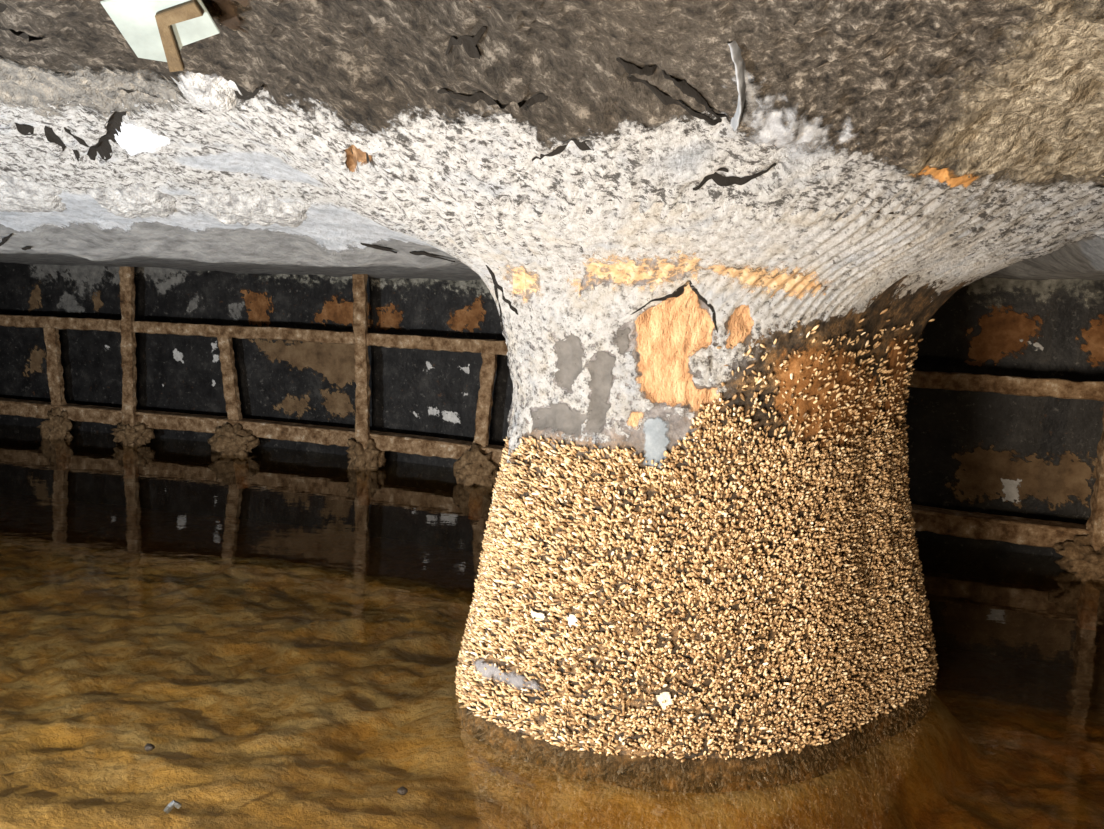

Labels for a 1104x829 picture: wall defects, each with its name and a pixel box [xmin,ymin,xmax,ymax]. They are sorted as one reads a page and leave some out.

rust [28,283,42,313]
rust [23,345,47,377]
rust [92,291,104,312]
rust [367,302,403,334]
rust [446,295,486,335]
spalling [531,285,719,437]
spalling [726,305,754,349]
rust [1075,314,1104,367]
peeling [627,412,670,469]
rust [945,441,1098,511]